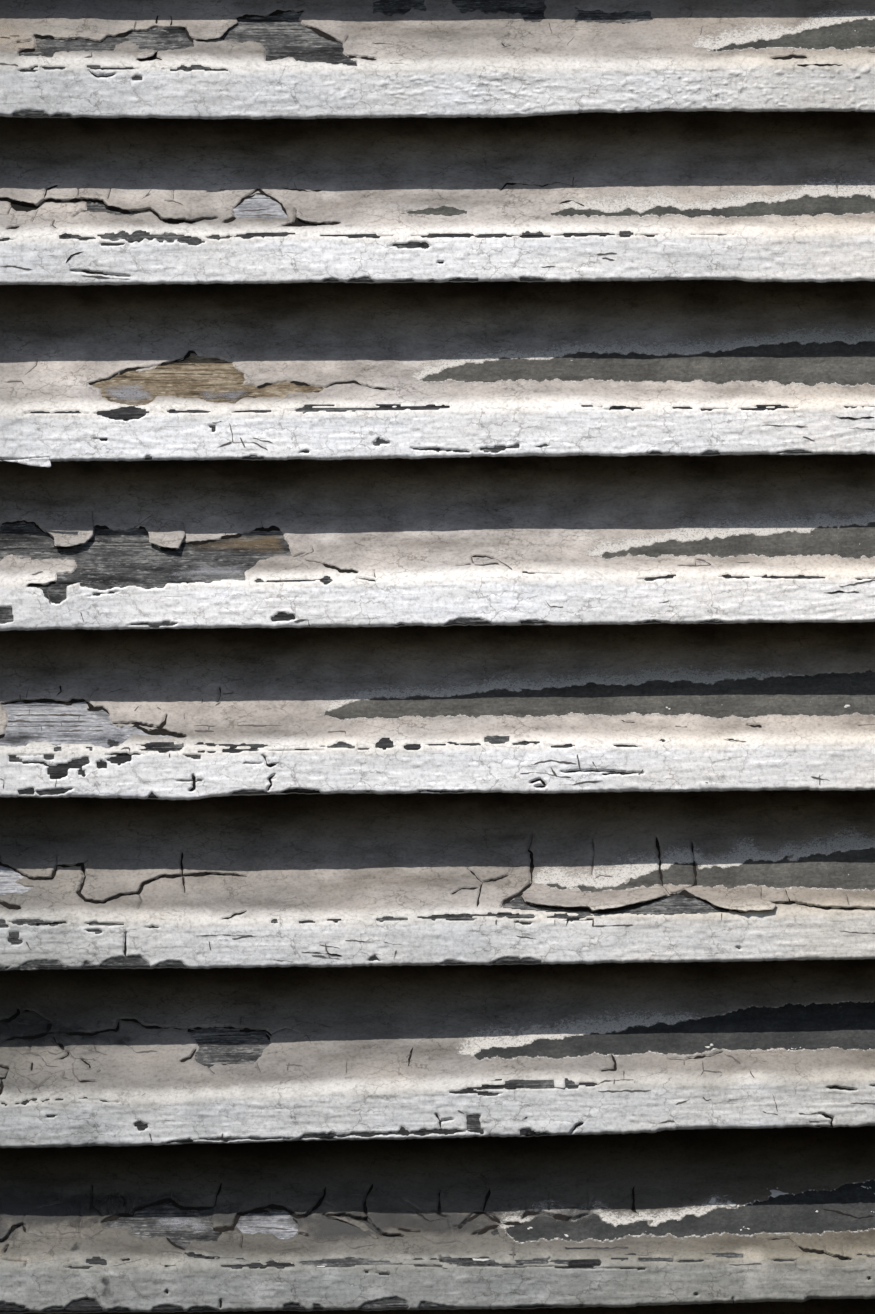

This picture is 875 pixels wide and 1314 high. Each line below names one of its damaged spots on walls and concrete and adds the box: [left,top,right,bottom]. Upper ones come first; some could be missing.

peeling [19,10,397,80]
crack [0,185,225,229]
crack [284,183,341,227]
peeling [413,322,875,387]
peeling [30,350,450,460]
peeling [0,511,333,604]
peeling [0,661,875,796]
crack [12,852,247,906]
crack [452,869,508,906]
crack [223,911,252,939]
crack [273,940,402,962]
peeling [449,1001,875,1096]